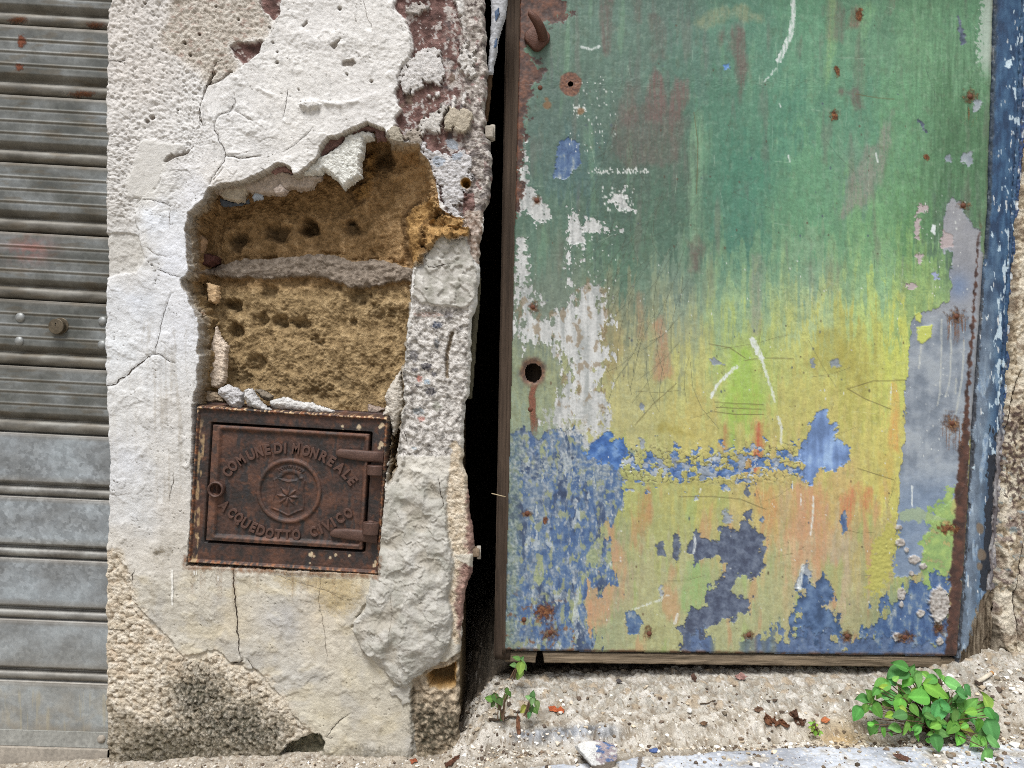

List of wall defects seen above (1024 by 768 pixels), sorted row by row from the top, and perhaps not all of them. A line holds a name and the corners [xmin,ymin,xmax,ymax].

spalling [160,0,281,85]
crack [199,59,256,182]
crack [107,247,178,386]
spalling [180,0,500,757]
rust [529,386,537,430]
peeling [505,135,852,653]
peeling [743,197,984,656]
water stain [108,681,316,761]
spalling [106,550,325,762]
crack [232,573,253,691]